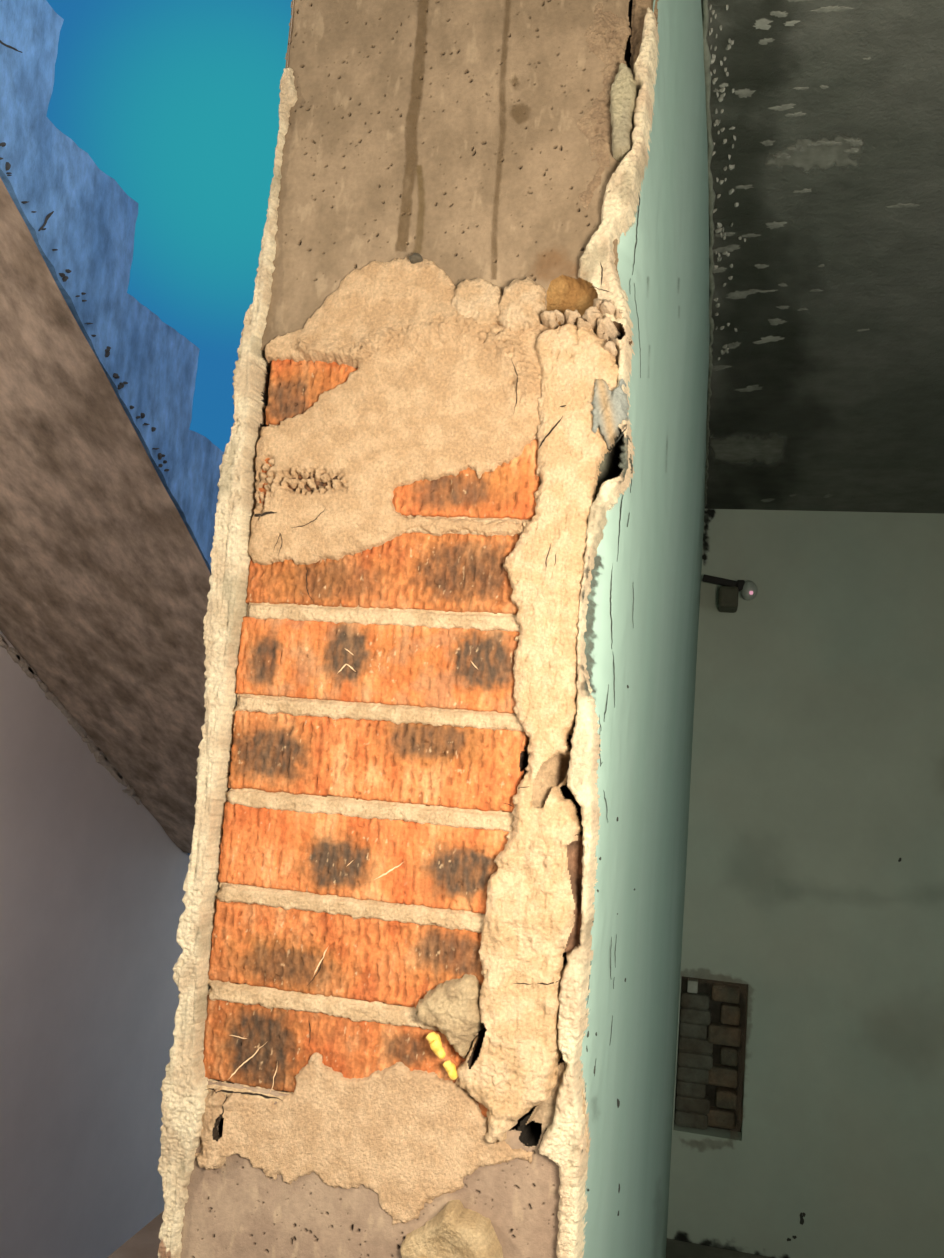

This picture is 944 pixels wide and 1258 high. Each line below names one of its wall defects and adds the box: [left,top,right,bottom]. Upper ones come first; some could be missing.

leakage [396,0,428,250]
leakage [495,94,522,199]
flaking render [0,634,142,805]
flaking render [157,3,659,1258]